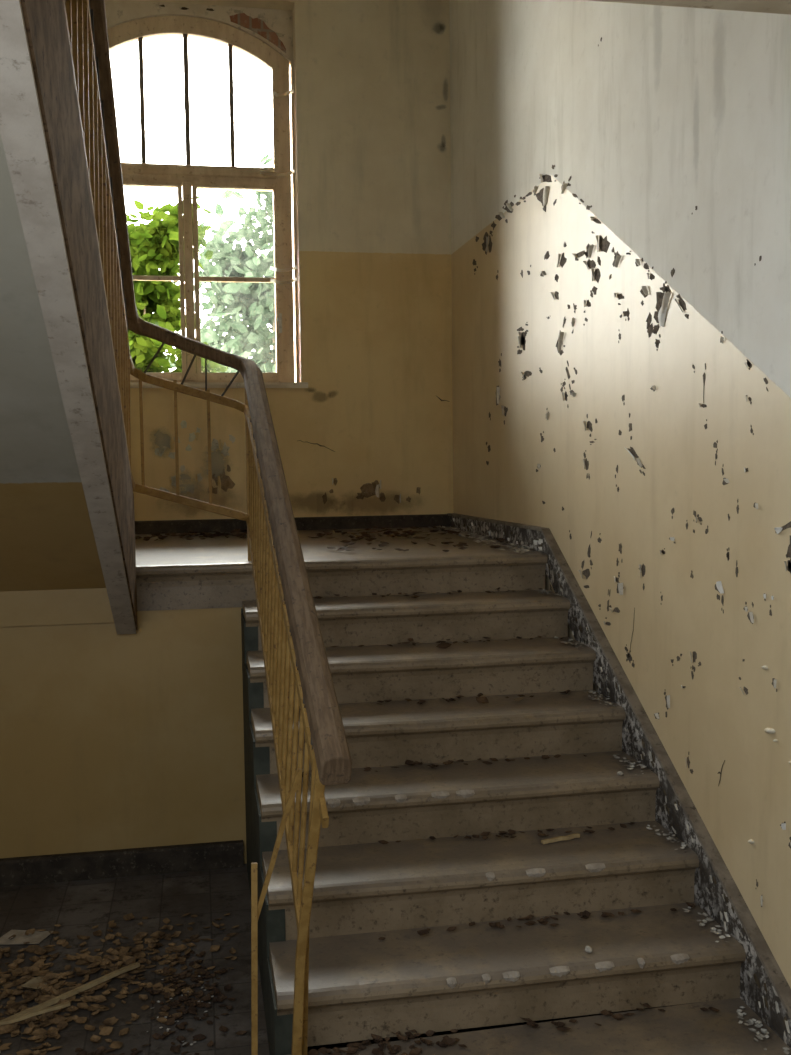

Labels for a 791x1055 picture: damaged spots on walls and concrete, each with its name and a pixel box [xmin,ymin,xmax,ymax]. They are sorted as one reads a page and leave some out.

spalling [230,9,286,53]
peeling [472,165,689,408]
peeling [583,414,597,479]
peeling [619,395,646,476]
peeling [208,463,235,494]
peeling [356,480,420,504]
peeling [578,531,602,588]
peeling [598,544,624,626]
peeling [715,581,724,613]
peeling [774,521,791,573]
peeling [671,651,701,688]
peeling [640,739,693,843]